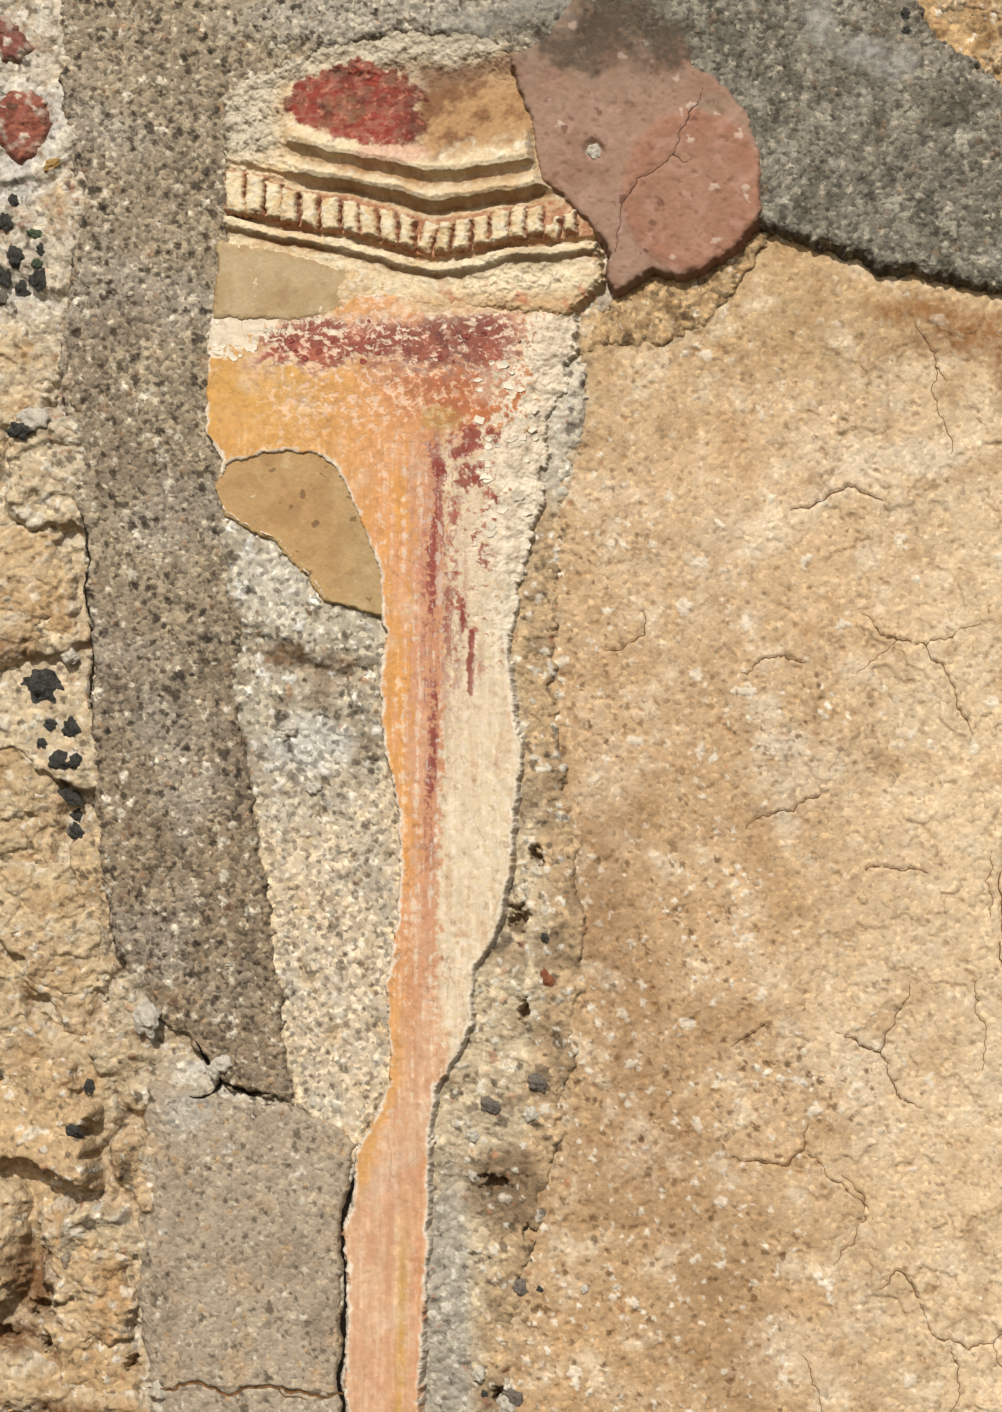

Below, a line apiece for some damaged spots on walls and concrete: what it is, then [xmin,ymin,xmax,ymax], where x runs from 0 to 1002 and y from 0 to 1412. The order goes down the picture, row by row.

spalling [212,240,384,361]
peeling [473,360,526,392]
crack [914,322,953,454]
peeling [472,406,539,546]
crack [790,485,884,511]
crack [857,613,979,741]
spalling [214,451,401,1164]
crack [974,851,1002,1070]
crack [836,986,923,1108]
crack [733,1126,873,1265]
crack [147,1143,358,1412]
crack [881,1270,1002,1412]